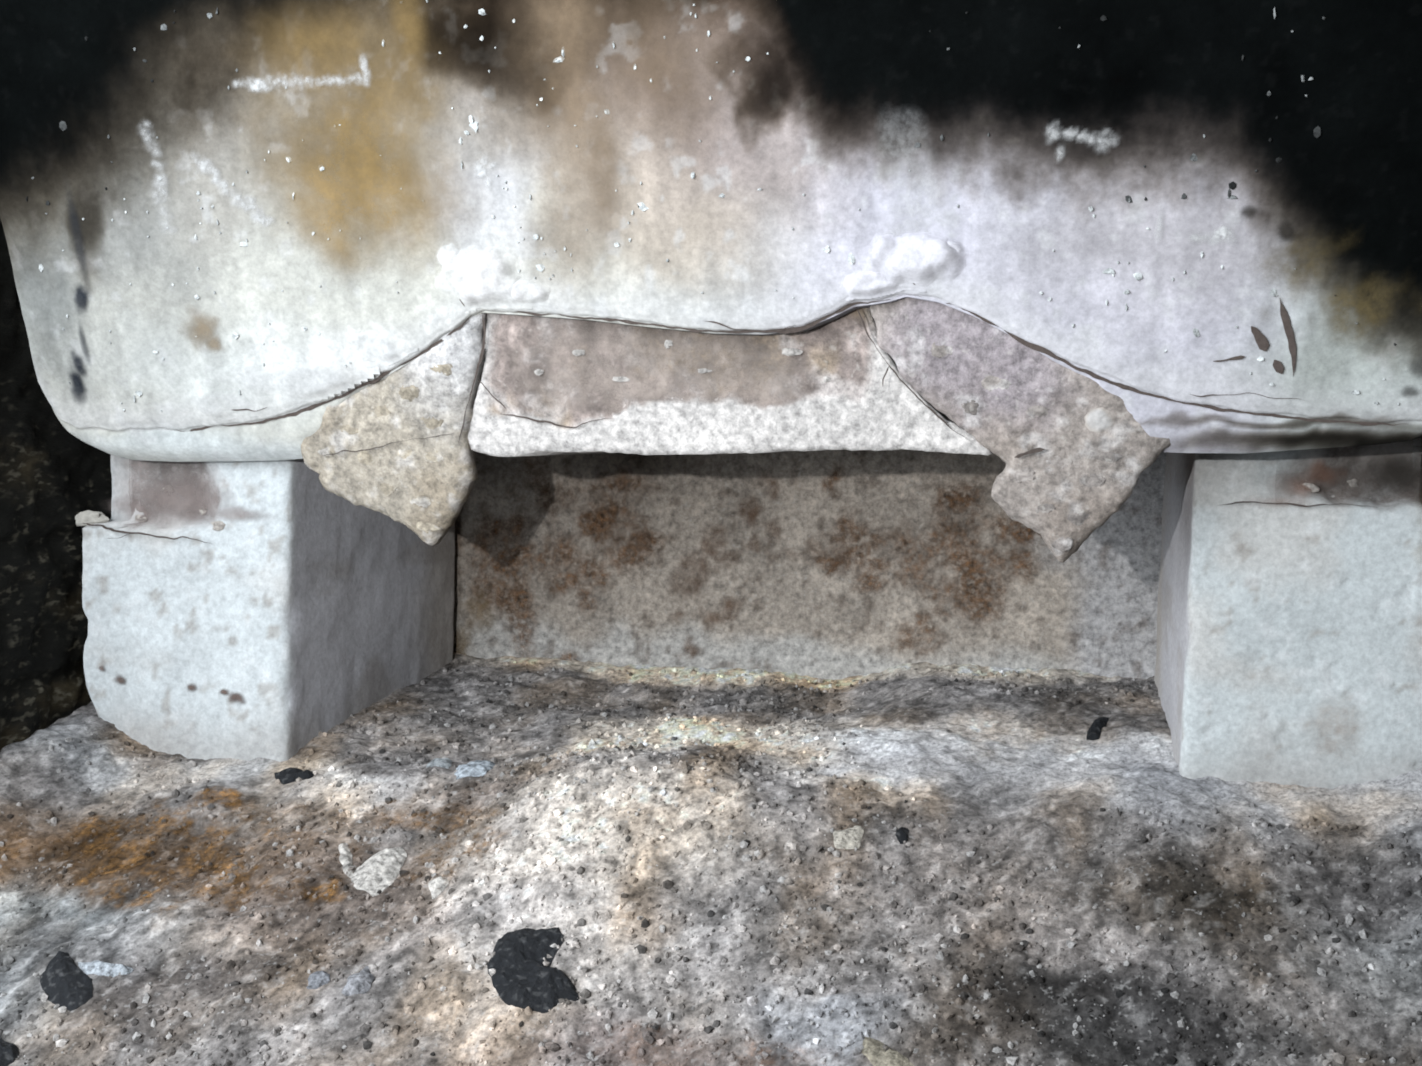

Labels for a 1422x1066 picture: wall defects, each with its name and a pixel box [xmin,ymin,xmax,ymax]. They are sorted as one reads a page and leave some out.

flaking render [301,313,487,546]
spalling [527,323,803,412]
flaking render [870,298,1171,563]
crack [83,523,212,544]
corrosion [472,515,657,643]
corrosion [818,519,882,589]
corrosion [900,486,1036,617]
corrosion [75,817,232,884]